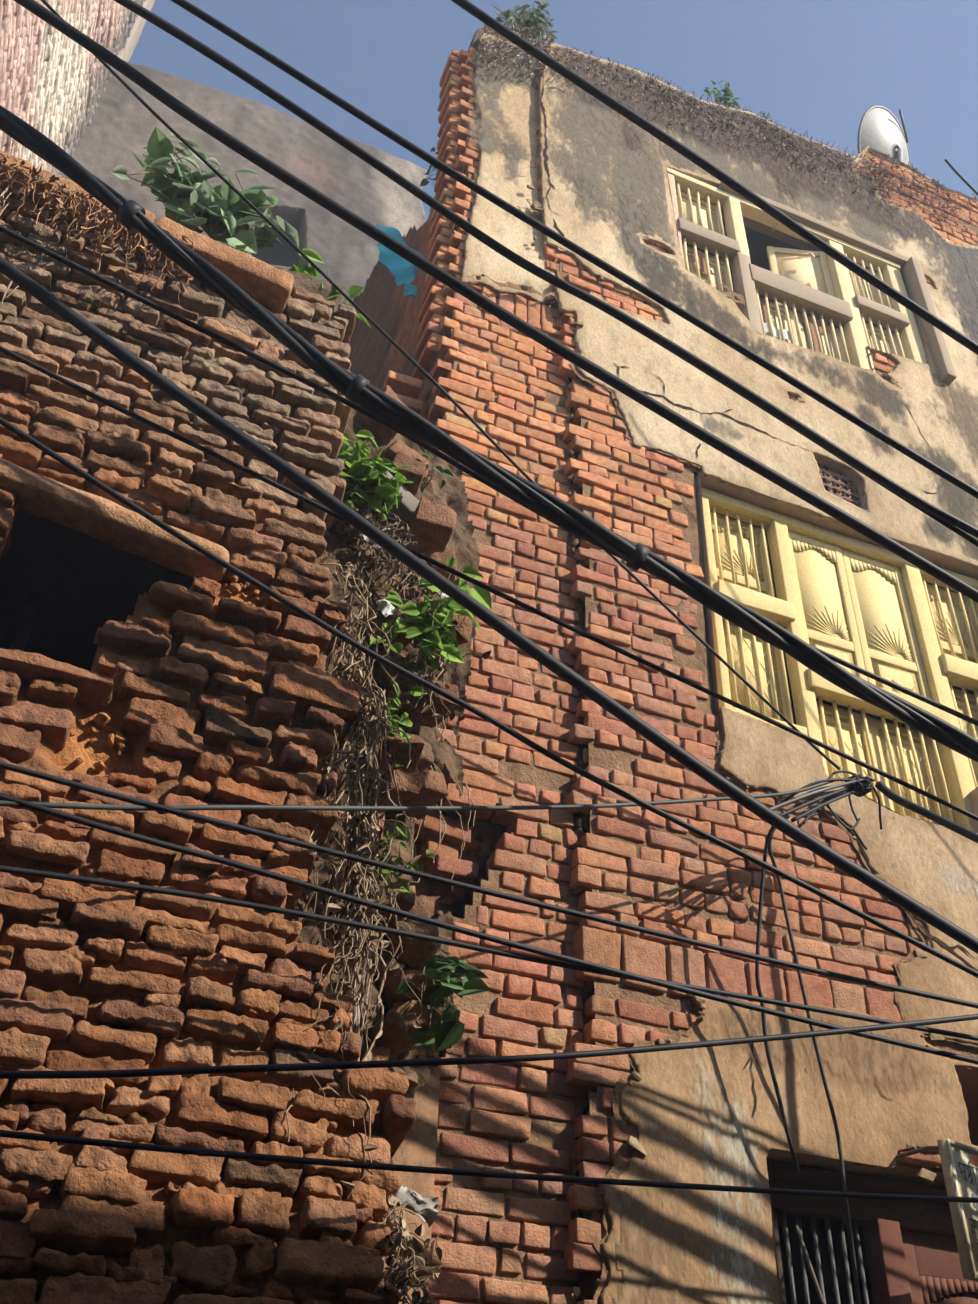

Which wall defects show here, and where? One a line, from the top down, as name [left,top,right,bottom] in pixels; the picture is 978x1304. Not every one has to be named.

crack [528,69,565,236]
spalling [465,236,668,324]
damp [470,39,978,453]
spalling [856,152,978,246]
crack [566,377,583,497]
crack [613,362,810,458]
damp [910,375,978,559]
crack [570,535,585,637]
spalling [394,824,506,919]
crack [571,693,589,848]
spalling [715,716,884,880]
spalling [593,995,706,1304]